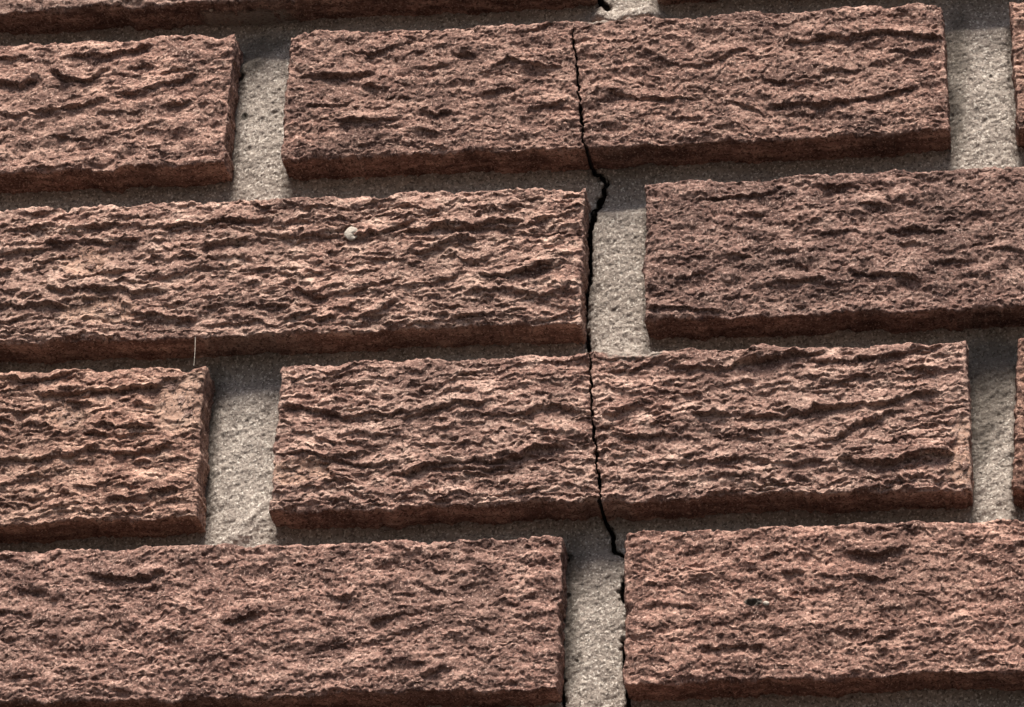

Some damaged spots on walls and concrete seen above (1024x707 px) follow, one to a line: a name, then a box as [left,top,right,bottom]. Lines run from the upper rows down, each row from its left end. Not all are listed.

crack [597,0,610,11]
crack [572,24,625,558]
crack [618,583,626,604]
crack [621,641,631,707]